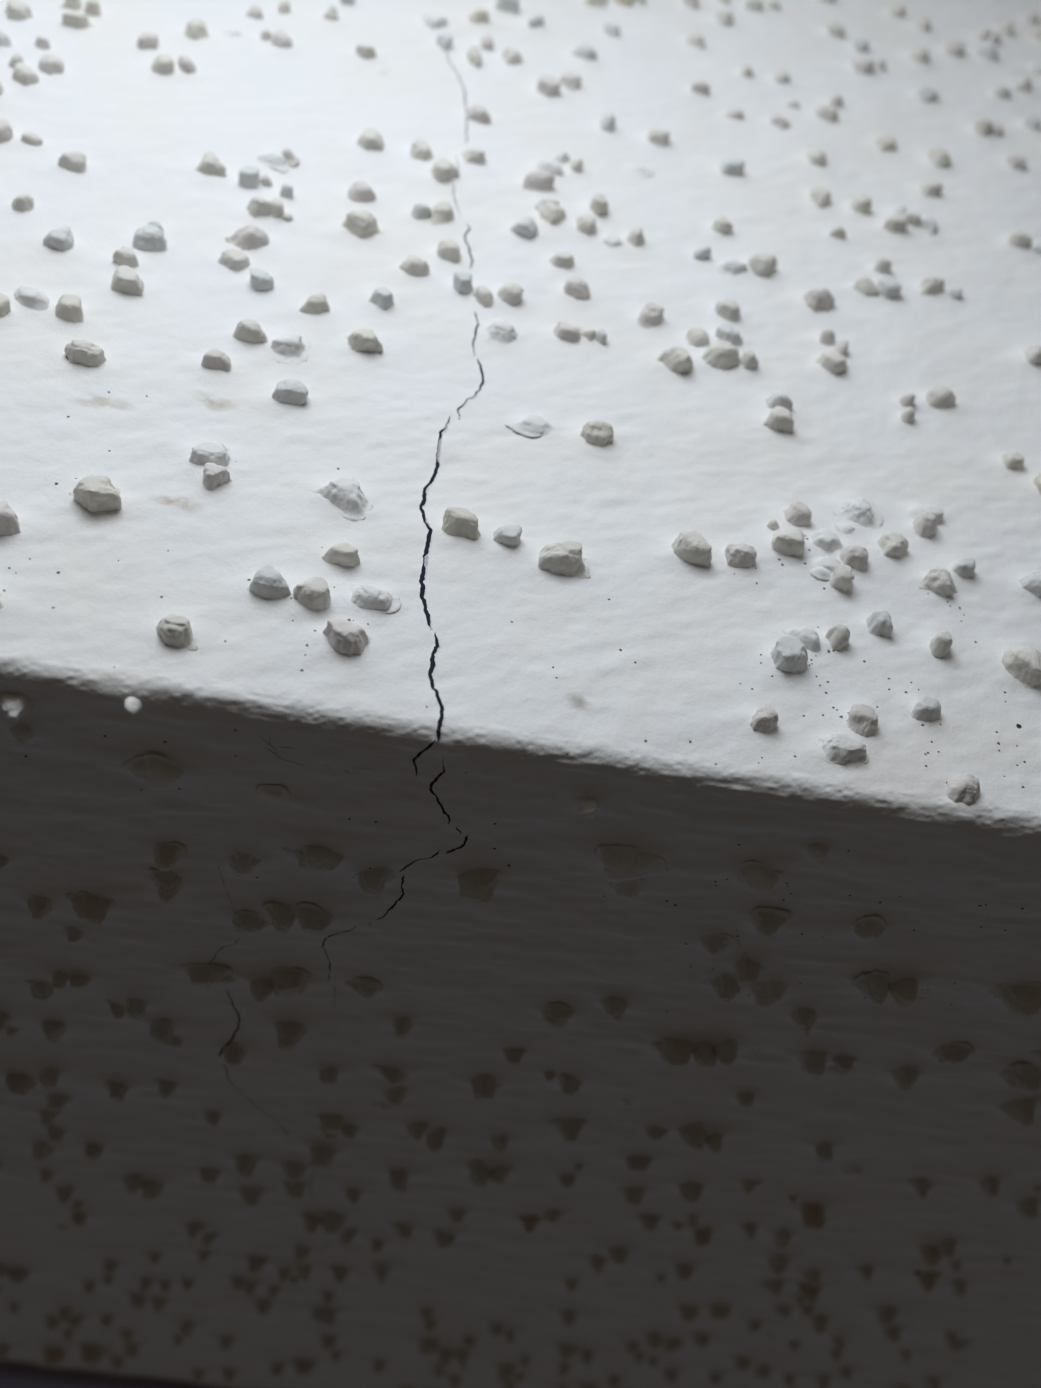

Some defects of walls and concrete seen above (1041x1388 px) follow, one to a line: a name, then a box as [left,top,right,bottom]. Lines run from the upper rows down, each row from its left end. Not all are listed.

crack [444,50,475,270]
crack [322,311,486,1001]
crack [208,868,291,1139]